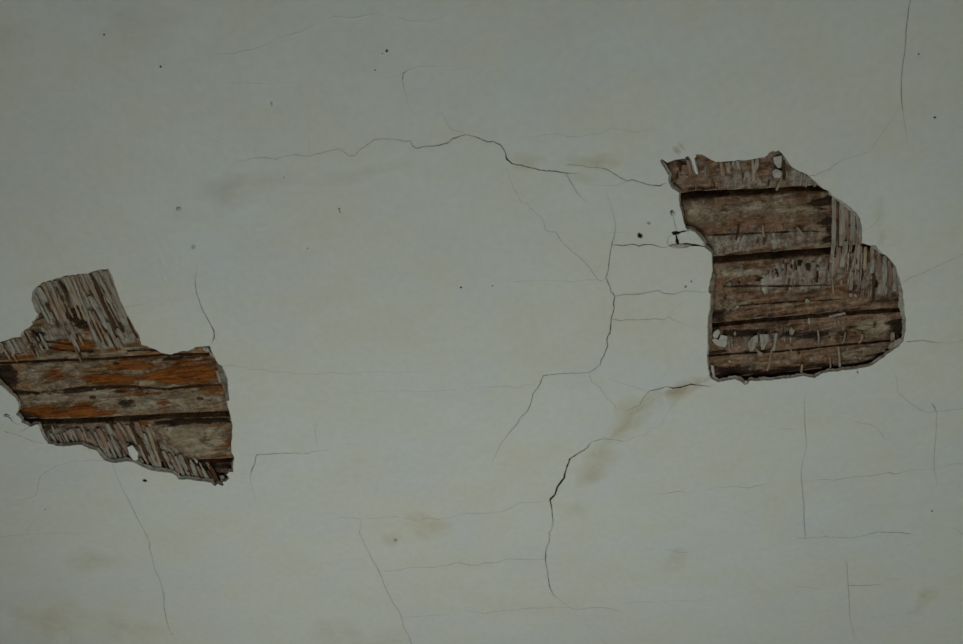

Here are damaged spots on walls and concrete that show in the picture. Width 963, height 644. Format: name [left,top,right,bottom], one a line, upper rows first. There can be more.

crack [420,135,569,174]
crack [601,244,656,360]
flaking render [660,151,906,385]
flaking render [0,347,234,486]
crack [549,447,588,517]